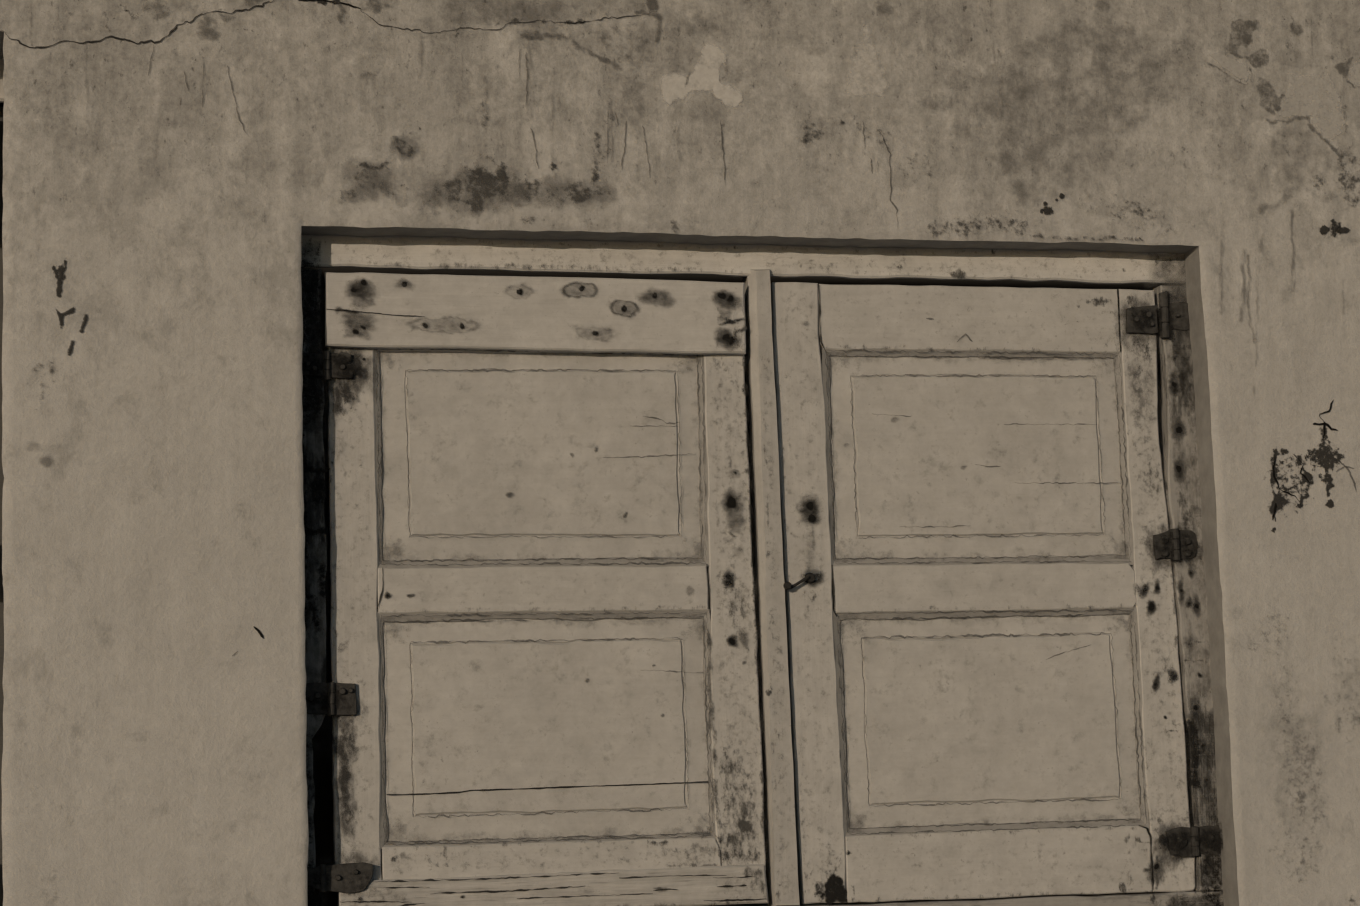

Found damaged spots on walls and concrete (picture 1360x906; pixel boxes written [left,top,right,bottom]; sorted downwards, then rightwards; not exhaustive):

crack [1,0,657,48]
peeling [661,46,742,107]
leakage [436,162,509,212]
leakage [568,133,601,202]
flaking render [1265,401,1346,532]